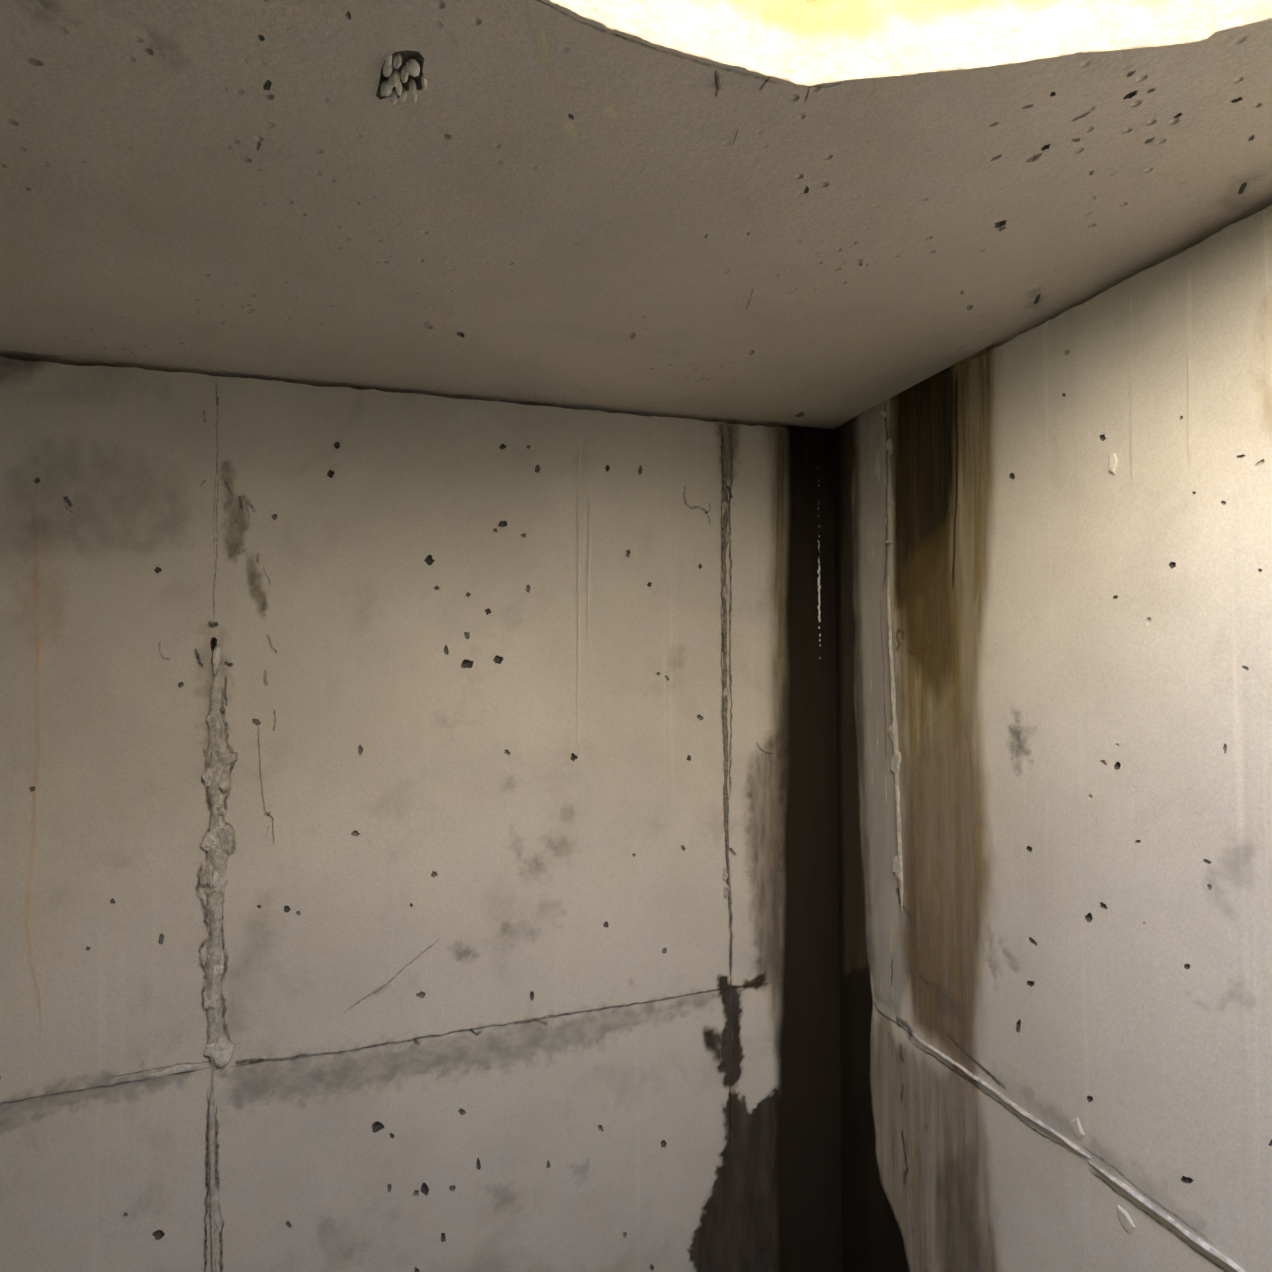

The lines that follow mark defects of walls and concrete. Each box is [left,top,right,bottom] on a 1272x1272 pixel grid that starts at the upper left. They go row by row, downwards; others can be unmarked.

spalling [376,50,427,105]
crack [168,622,276,1030]
crack [237,434,743,1064]
water stain [688,418,909,1272]
crack [2,1063,203,1104]
crack [204,1099,224,1272]
crack [900,1132,908,1184]
crack [874,959,1062,1145]
crack [1094,1159,1227,1272]